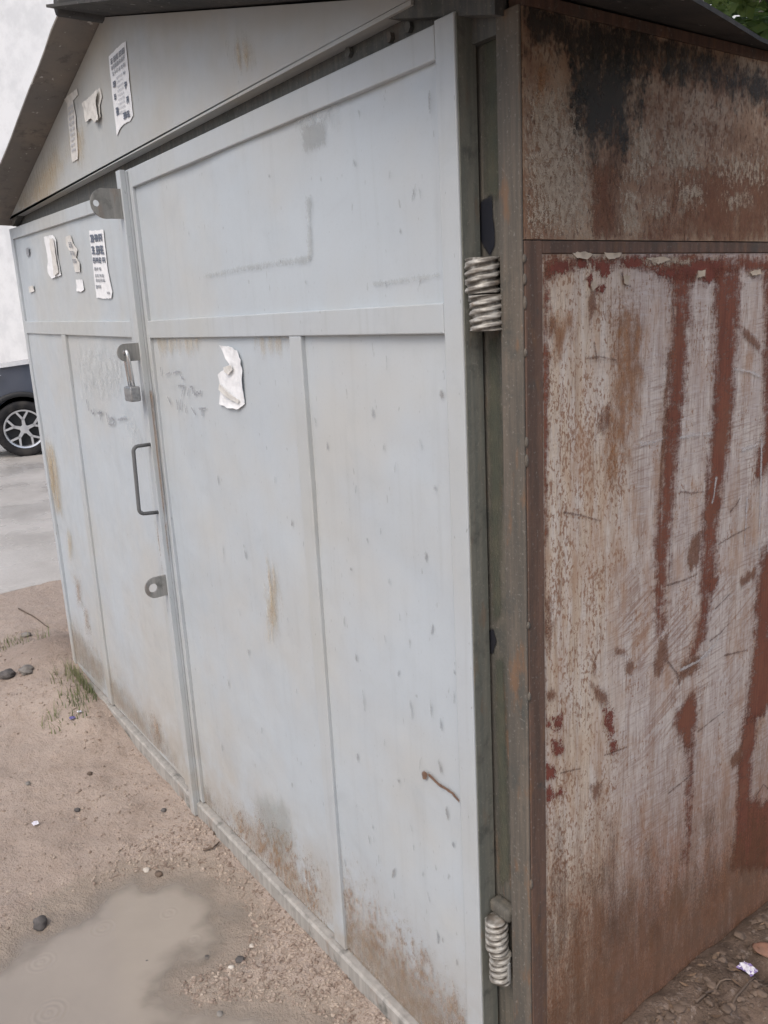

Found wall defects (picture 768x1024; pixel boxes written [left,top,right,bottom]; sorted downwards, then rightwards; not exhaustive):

water stain [523,6,768,166]
peeling [570,251,626,260]
peeling [639,254,718,279]
corrosion [638,157,768,241]
corrosion [543,254,768,683]
corrosion [674,692,700,863]
corrosion [731,545,768,872]